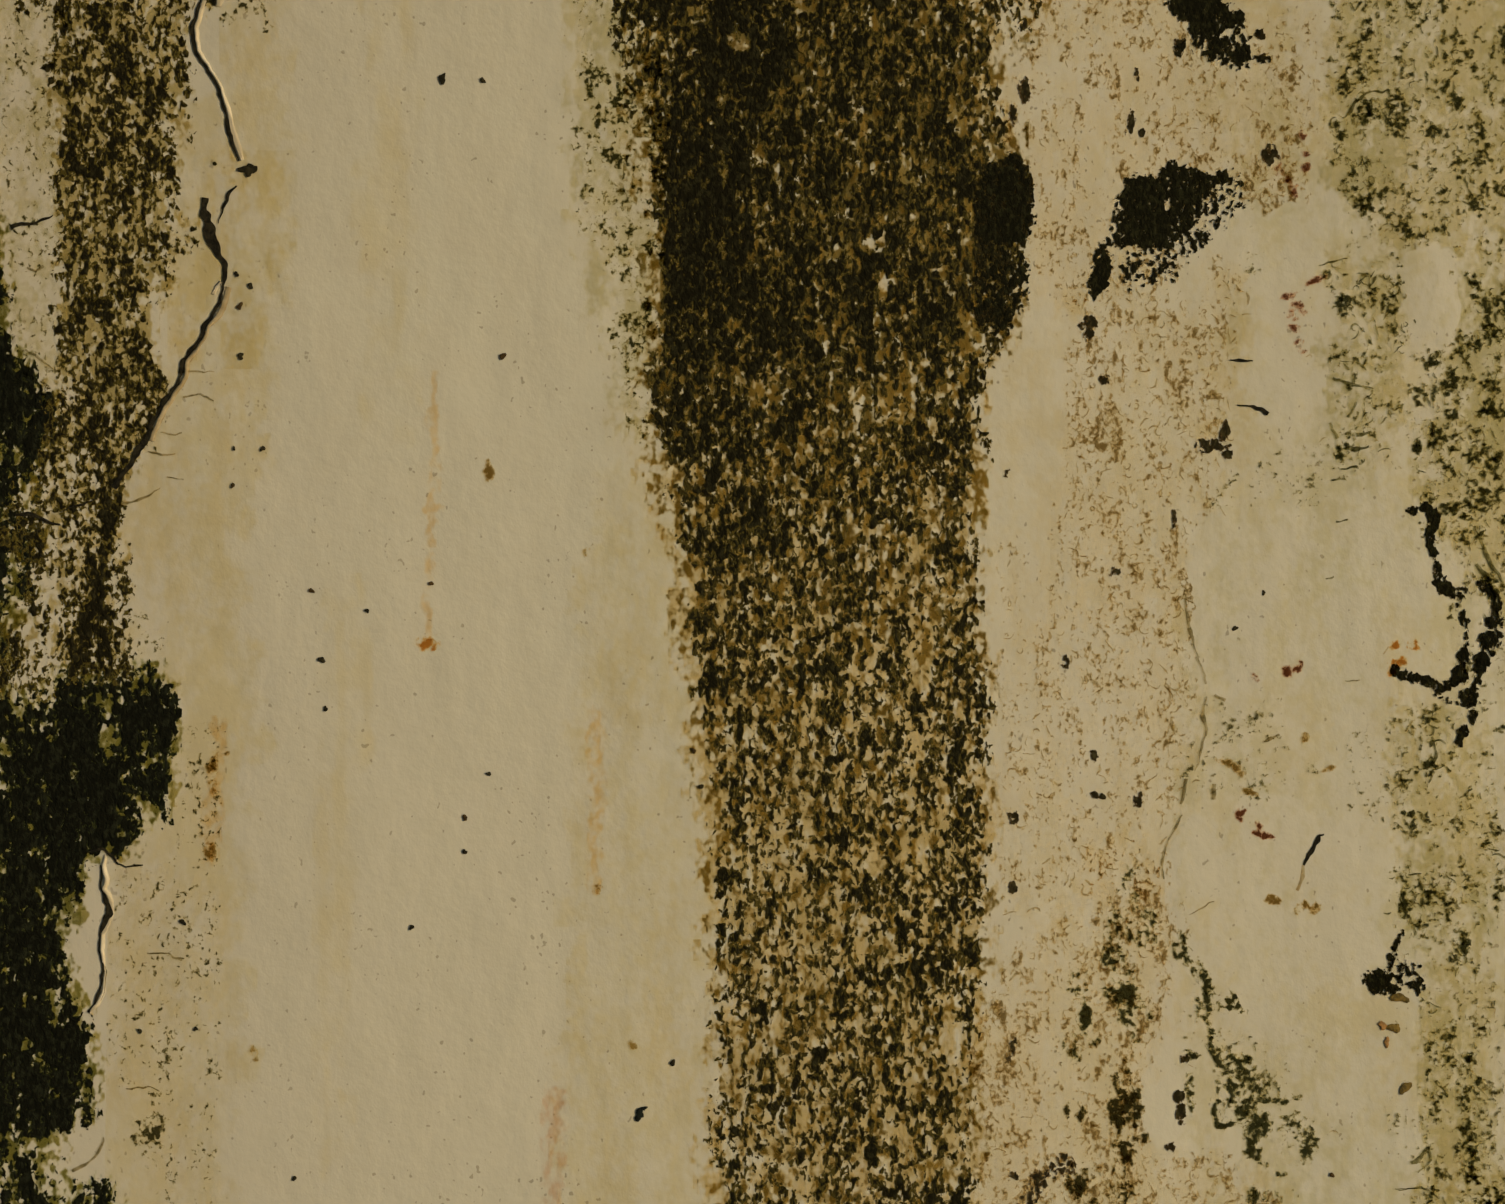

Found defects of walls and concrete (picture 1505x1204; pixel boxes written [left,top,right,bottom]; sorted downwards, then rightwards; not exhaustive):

crack [10,0,244,525]
water stain [0,0,269,1204]
water stain [573,0,1505,1204]